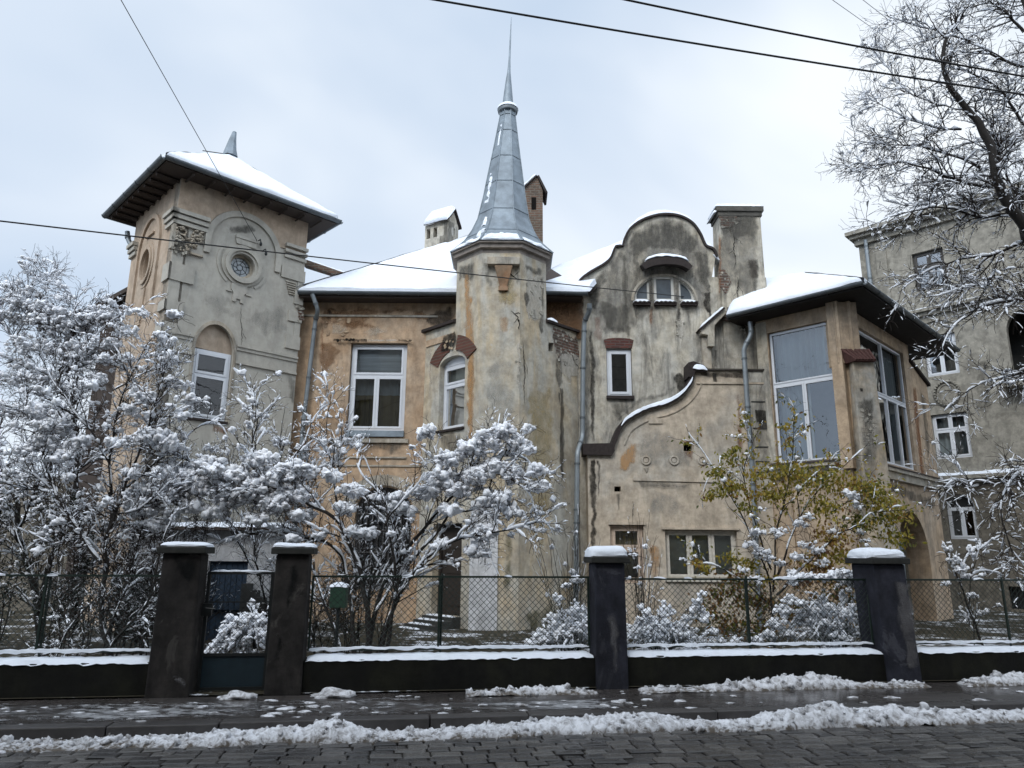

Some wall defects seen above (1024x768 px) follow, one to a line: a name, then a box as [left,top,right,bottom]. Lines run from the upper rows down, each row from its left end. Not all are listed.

spalling [717,269,731,293]
crack [730,233,743,297]
crack [513,312,528,403]
spalling [525,276,579,379]
leakage [530,363,564,479]
peeling [621,445,635,470]